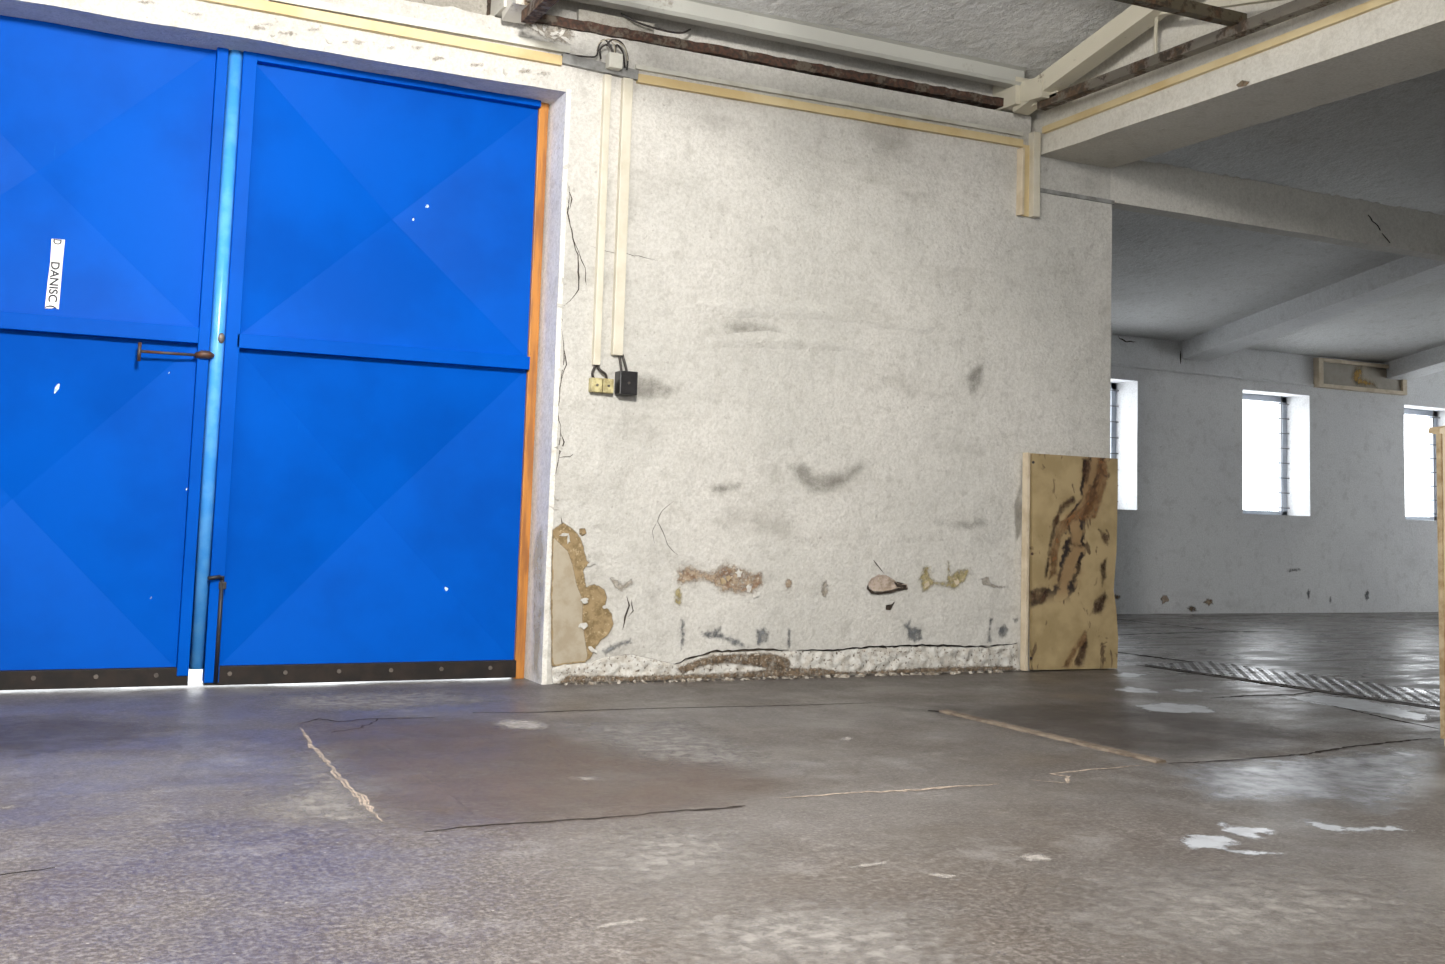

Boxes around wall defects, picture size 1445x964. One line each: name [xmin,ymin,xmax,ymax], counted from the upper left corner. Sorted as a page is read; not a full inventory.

flaking render [549,473,1020,685]
peeling [1428,426,1445,746]